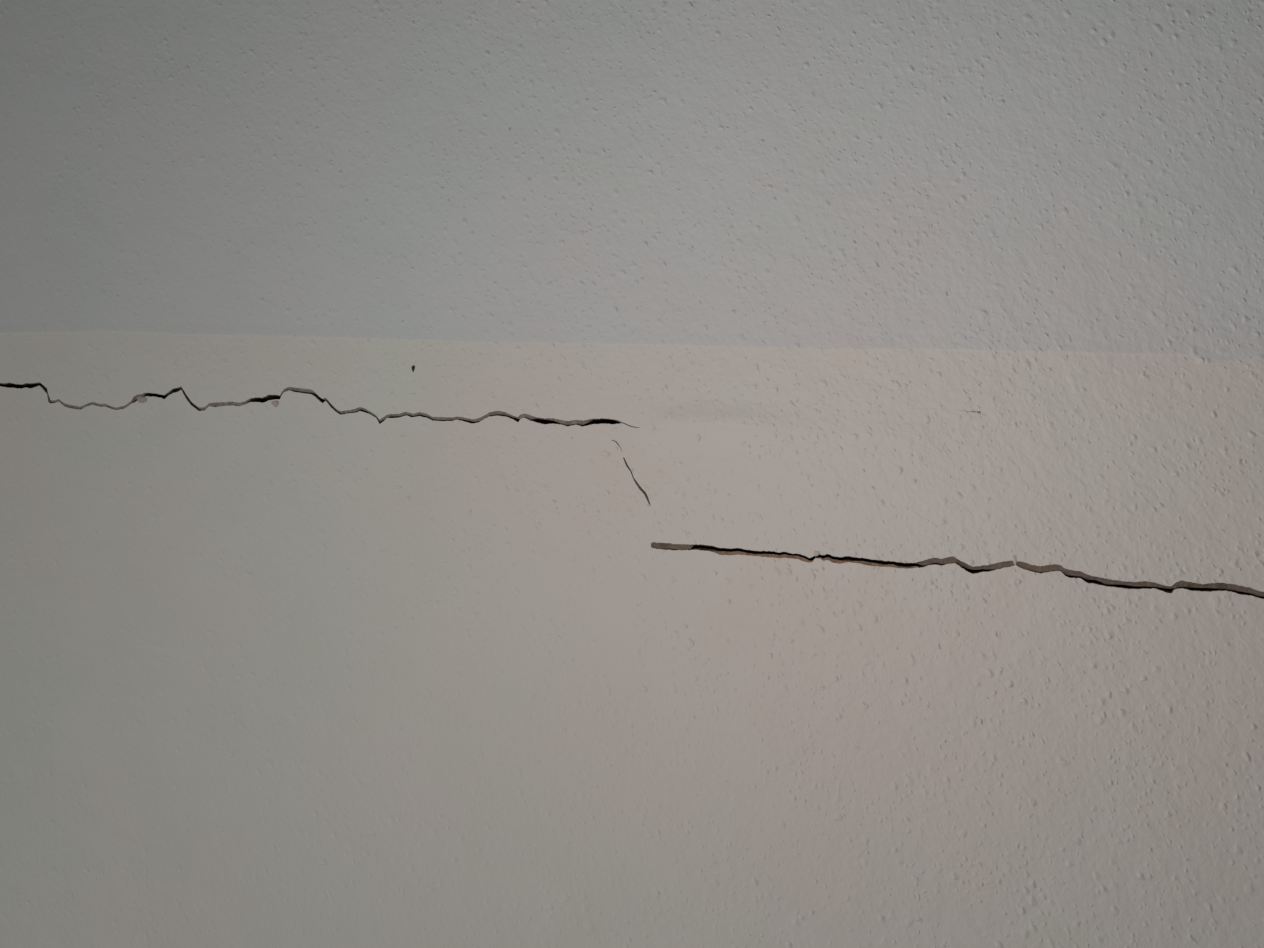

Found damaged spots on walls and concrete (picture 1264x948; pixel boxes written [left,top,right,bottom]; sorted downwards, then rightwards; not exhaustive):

crack [0,382,650,505]
crack [651,542,1264,599]